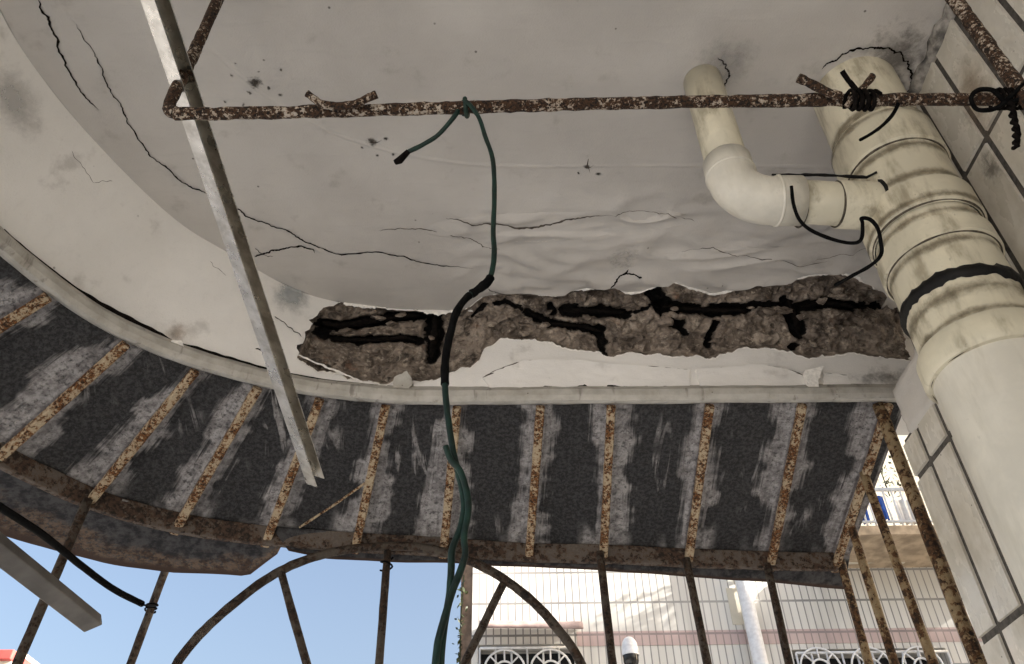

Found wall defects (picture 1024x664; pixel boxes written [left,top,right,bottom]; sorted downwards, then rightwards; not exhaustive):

crack [38,0,207,194]
crack [822,47,913,92]
crack [238,209,491,269]
crack [610,270,642,289]
spalling [297,273,935,433]